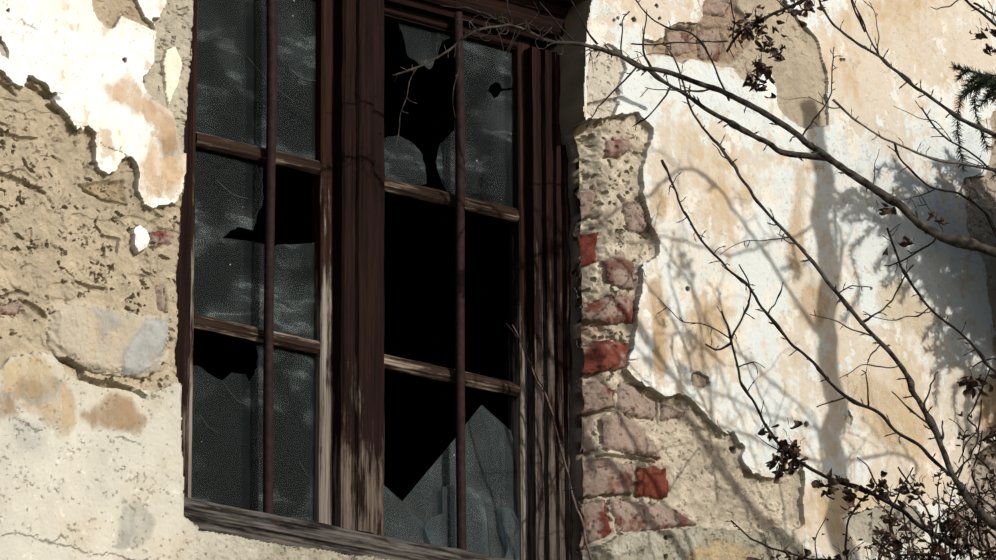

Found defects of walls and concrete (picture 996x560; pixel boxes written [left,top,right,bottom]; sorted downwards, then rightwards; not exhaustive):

spalling [0,31,9,59]
spalling [92,0,193,155]
spalling [644,0,831,129]
spalling [0,69,186,392]
flaking render [565,40,806,554]
spalling [962,102,996,355]